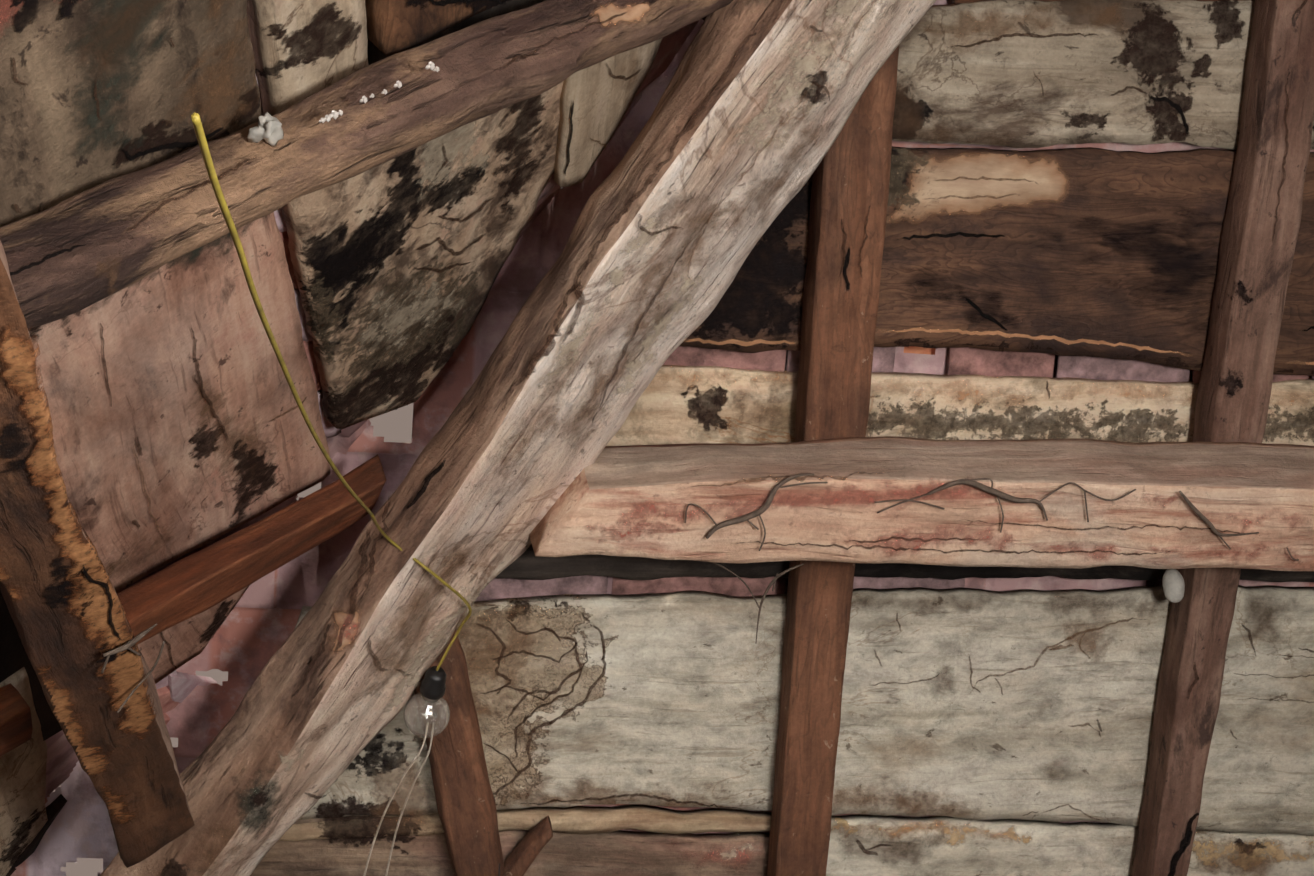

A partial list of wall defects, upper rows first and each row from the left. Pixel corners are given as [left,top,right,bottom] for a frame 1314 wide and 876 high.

damp [406,0,512,15]
damp [952,0,1245,141]
damp [886,83,1004,219]
damp [298,94,551,425]
damp [902,232,1004,240]
damp [1084,216,1218,310]
damp [946,291,1014,331]
damp [866,383,1193,443]
damp [1264,400,1314,443]
crack [1241,624,1314,703]